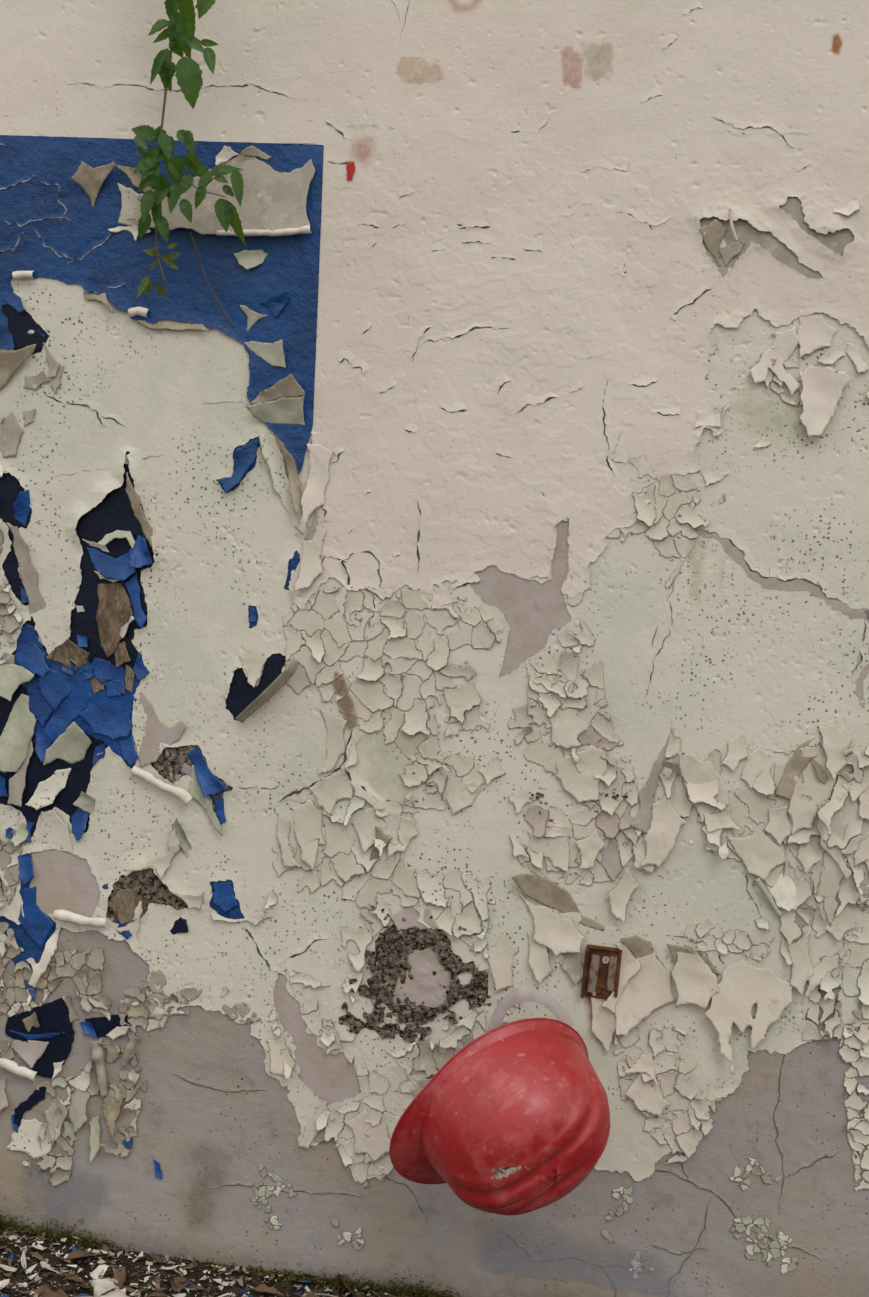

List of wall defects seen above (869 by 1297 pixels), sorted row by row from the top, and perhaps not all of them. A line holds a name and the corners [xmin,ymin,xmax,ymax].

corrosion [832,35,842,53]
crack [67,78,362,181]
crack [711,115,810,173]
peeling [71,145,316,270]
peeling [700,208,823,279]
peeling [779,196,860,256]
peeling [0,271,64,394]
peeling [83,291,209,332]
crack [694,526,869,706]
peeling [0,409,278,1187]
spalling [216,290,869,1192]
crack [651,1053,842,1297]